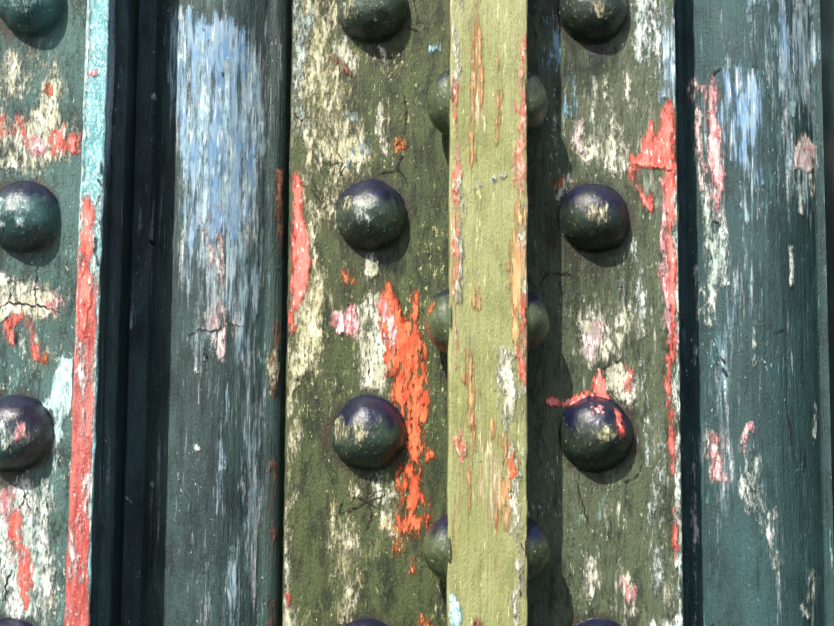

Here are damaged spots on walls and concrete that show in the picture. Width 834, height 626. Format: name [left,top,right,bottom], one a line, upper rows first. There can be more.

peeling [623,0,675,119]
crack [0,265,60,313]
peeling [0,0,102,440]
crack [187,323,245,335]
peeling [287,0,437,558]
peeling [545,237,647,415]
peeling [571,78,683,626]
peeling [687,68,730,327]
peeling [0,471,56,621]
peeling [67,457,93,583]
peeling [283,493,300,626]
crack [333,481,386,531]